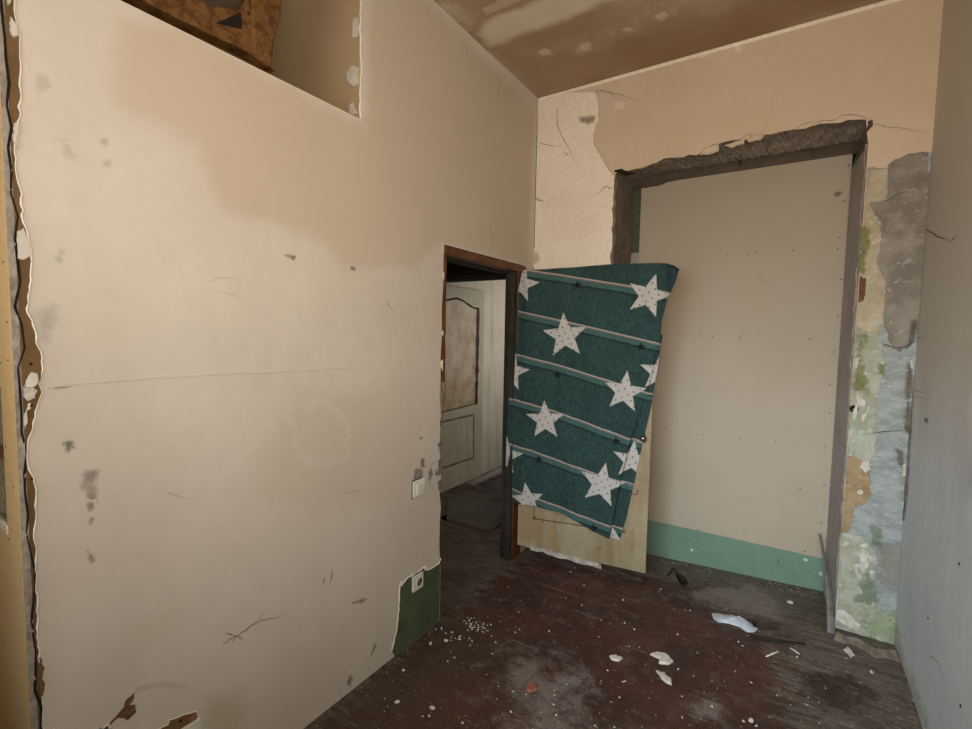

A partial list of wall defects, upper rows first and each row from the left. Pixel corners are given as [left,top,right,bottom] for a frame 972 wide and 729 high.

water stain [94,0,883,282]
flaking render [534,92,636,270]
flaking render [16,228,31,260]
flaking render [23,372,39,427]
flaking render [836,120,932,642]
crack [223,609,285,645]
peeling [391,558,441,656]
spalling [118,705,136,720]